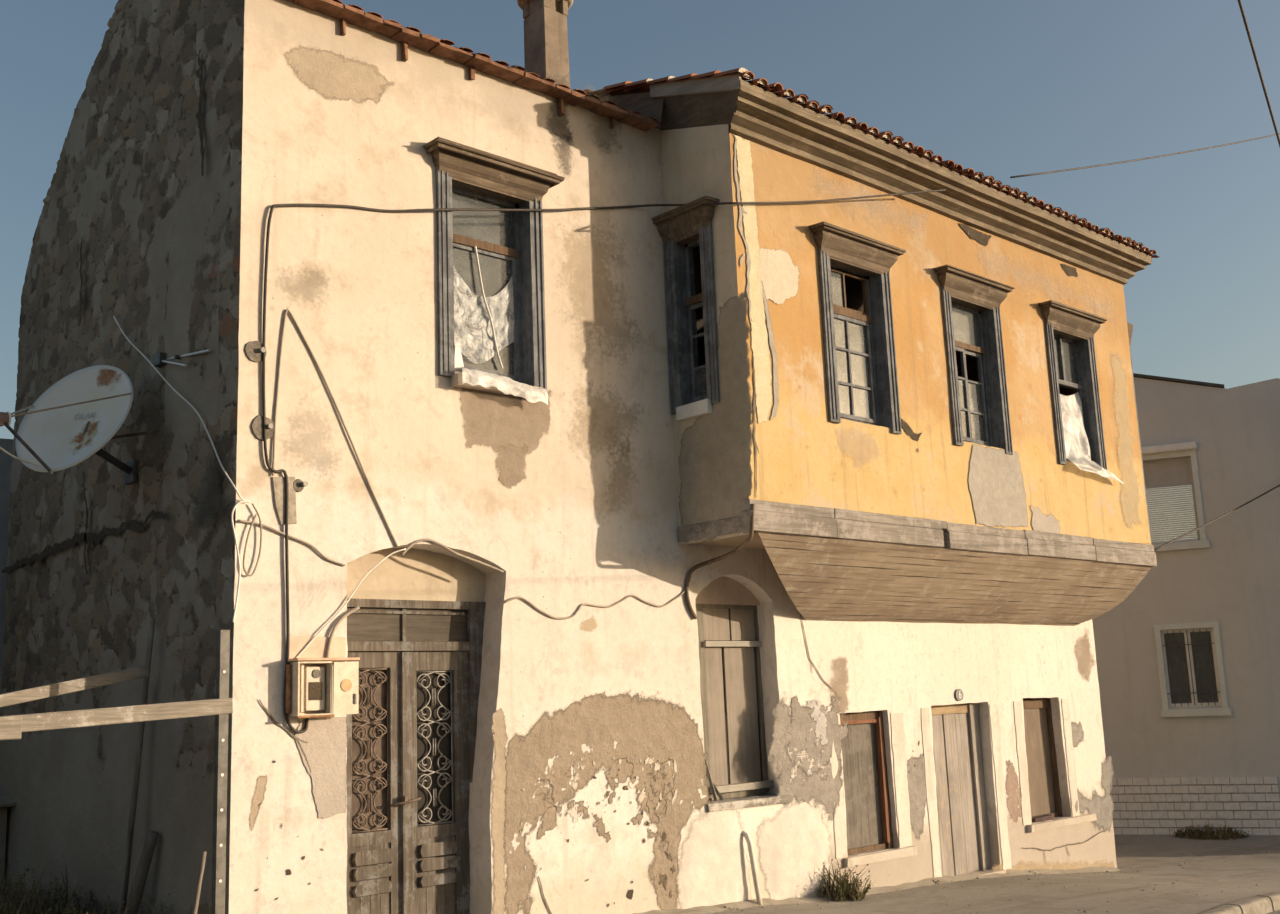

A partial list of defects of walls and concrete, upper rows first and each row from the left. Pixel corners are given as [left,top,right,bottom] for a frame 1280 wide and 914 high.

peeling [285,46,394,103]
peeling [679,135,800,542]
peeling [968,444,1060,534]
peeling [491,692,711,914]
peeling [769,694,848,822]
spalling [907,742,927,839]
peeling [1005,760,1022,822]